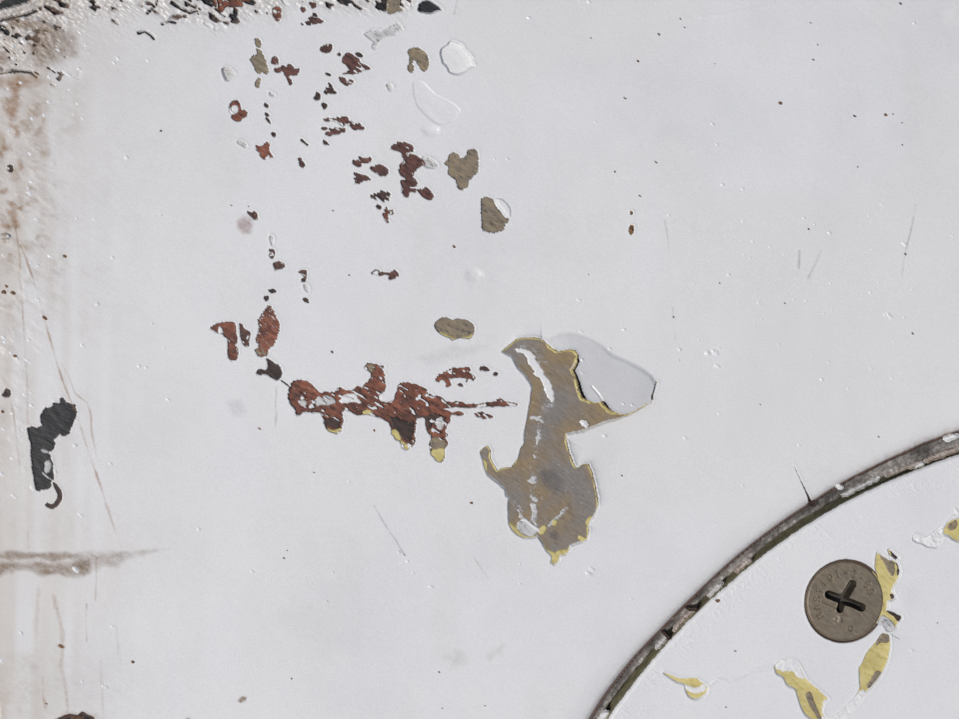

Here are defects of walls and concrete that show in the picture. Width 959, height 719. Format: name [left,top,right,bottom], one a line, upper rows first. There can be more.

peeling [0,0,441,87]
peeling [230,101,247,121]
peeling [256,93,276,159]
peeling [314,44,370,145]
peeling [371,191,393,222]
peeling [353,142,478,200]
peeling [481,197,511,232]
peeling [211,289,508,462]
peeling [28,398,77,508]
peeling [480,331,657,564]
peeling [912,507,959,547]
peeling [775,550,901,719]